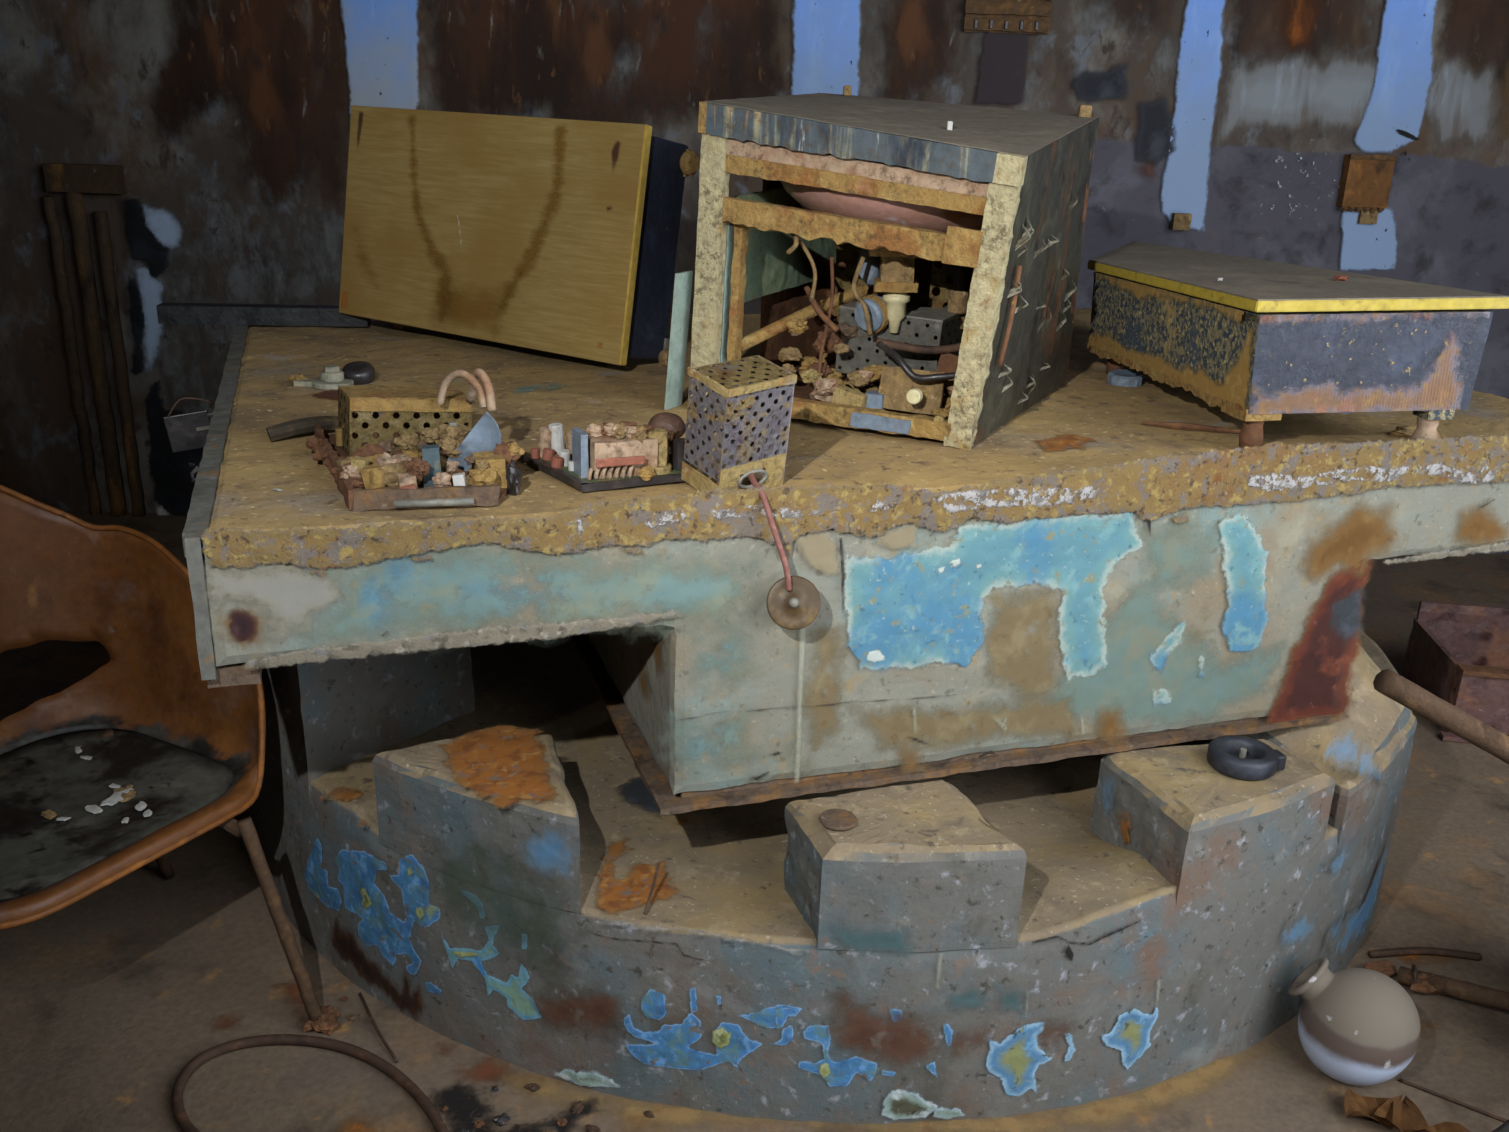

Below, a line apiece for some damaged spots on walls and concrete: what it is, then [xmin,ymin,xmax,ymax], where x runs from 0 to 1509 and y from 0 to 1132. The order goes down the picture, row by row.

corrosion [1234,0,1369,62]
corrosion [228,610,262,642]
spalling [200,433,1509,726]
corrosion [1268,508,1396,724]
corrosion [439,725,559,808]
corrosion [597,838,678,915]
peeling [304,838,441,995]
peeling [623,988,896,1087]
peeling [986,1022,1076,1097]
peeling [1102,1007,1158,1070]
leakage [433,1069,619,1132]
leakage [882,1090,964,1120]